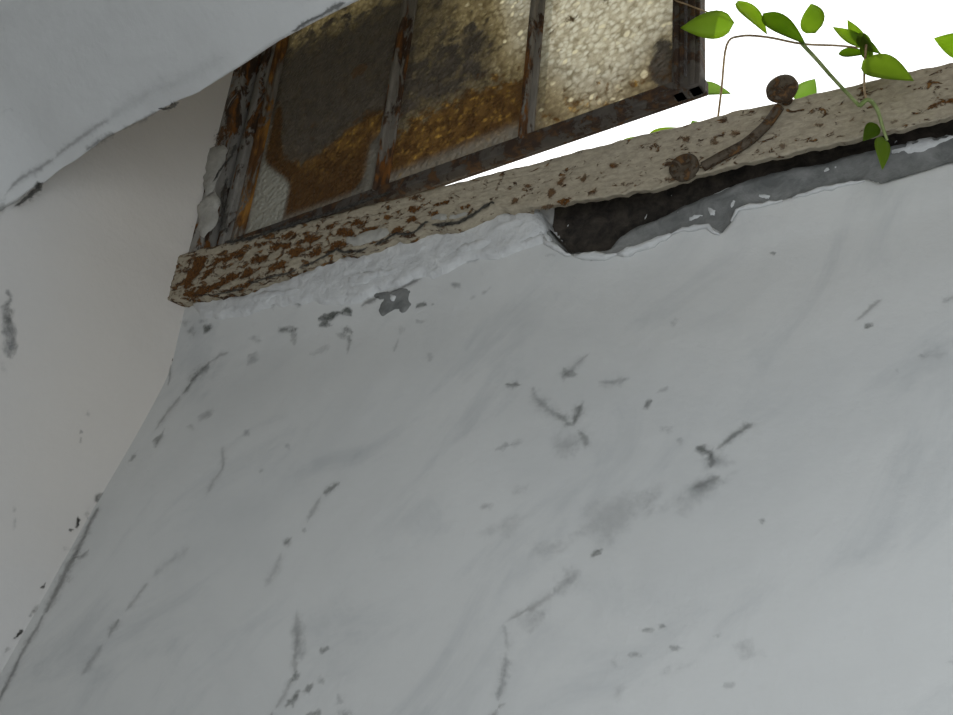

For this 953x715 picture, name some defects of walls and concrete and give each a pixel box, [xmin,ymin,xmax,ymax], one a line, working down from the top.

peeling [197,126,236,238]
corrosion [541,177,571,210]
flaking render [542,120,953,261]
corrosion [183,200,449,300]
flaking render [374,288,426,316]